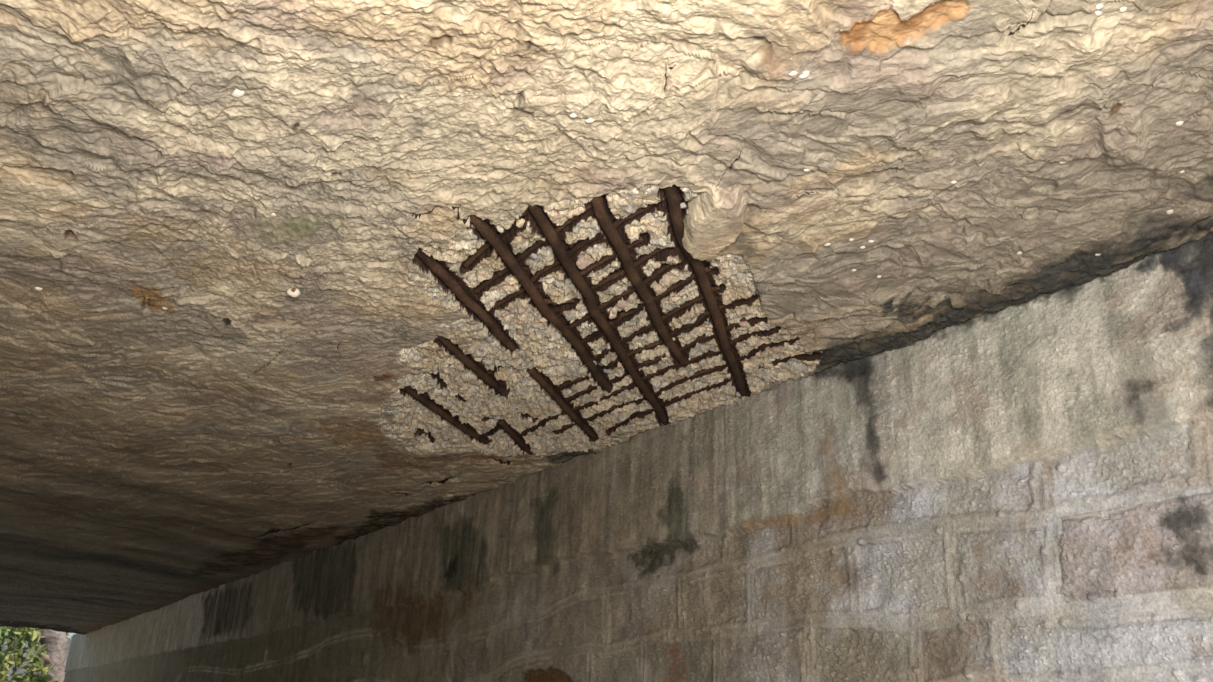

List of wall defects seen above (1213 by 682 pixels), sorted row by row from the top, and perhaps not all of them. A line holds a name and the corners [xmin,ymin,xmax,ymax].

peeling [841,0,1011,52]
spalling [378,177,823,457]
leakage [816,217,1213,480]
leakage [1162,507,1206,574]
corrosion [524,667,572,682]